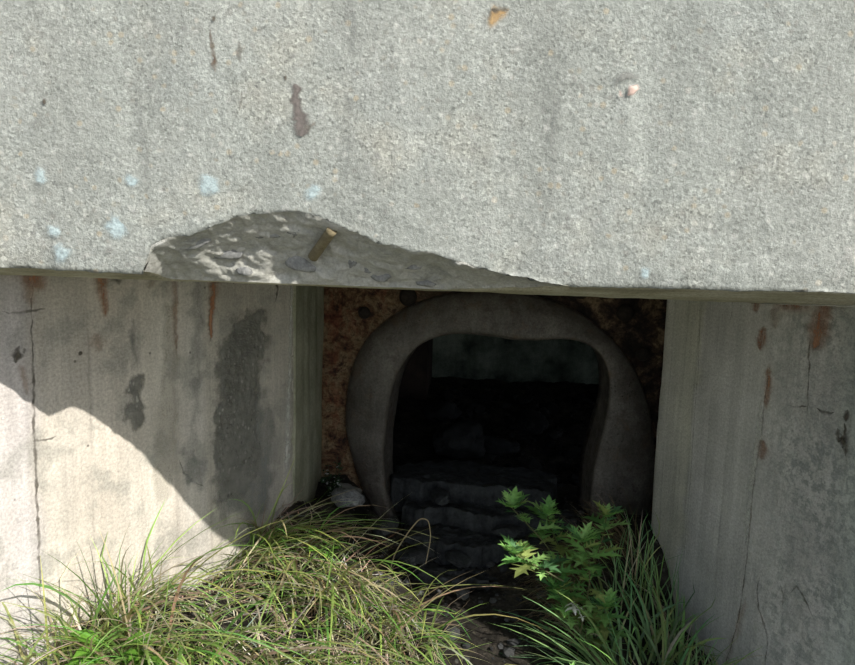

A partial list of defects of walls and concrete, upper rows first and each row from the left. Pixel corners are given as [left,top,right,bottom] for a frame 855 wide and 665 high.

crack [25,306,56,588]
corrosion [208,282,216,339]